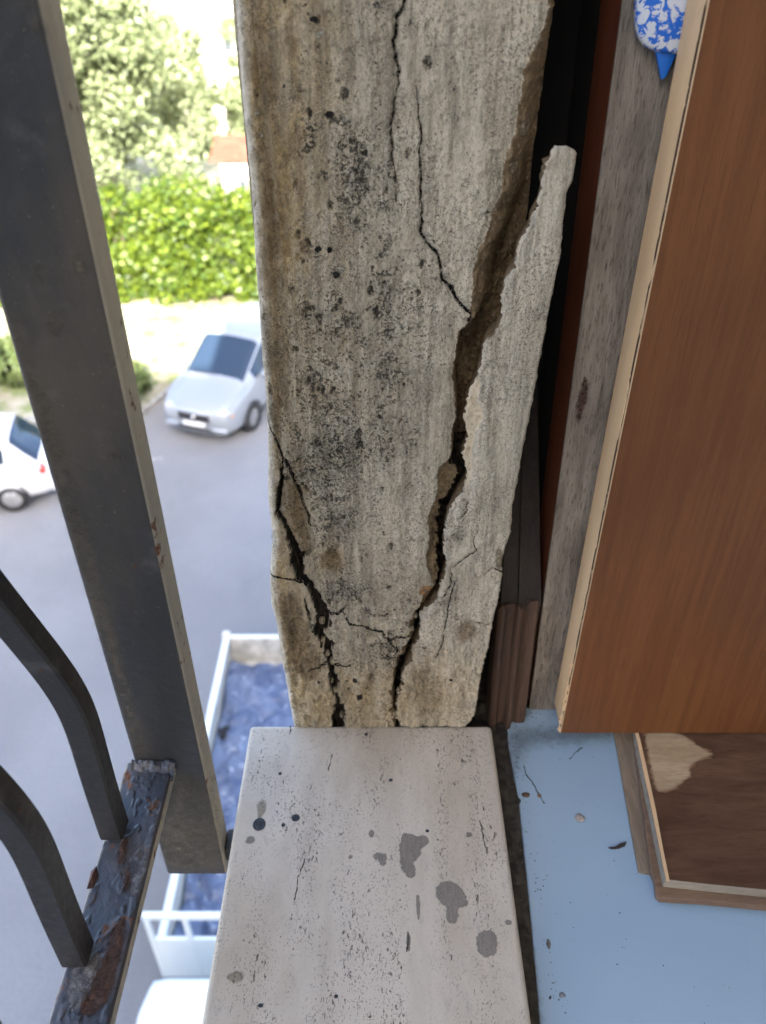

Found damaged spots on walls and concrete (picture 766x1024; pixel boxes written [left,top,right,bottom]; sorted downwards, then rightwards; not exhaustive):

crack [390,0,472,326]
crack [267,415,469,727]
corrosion [80,919,125,1017]